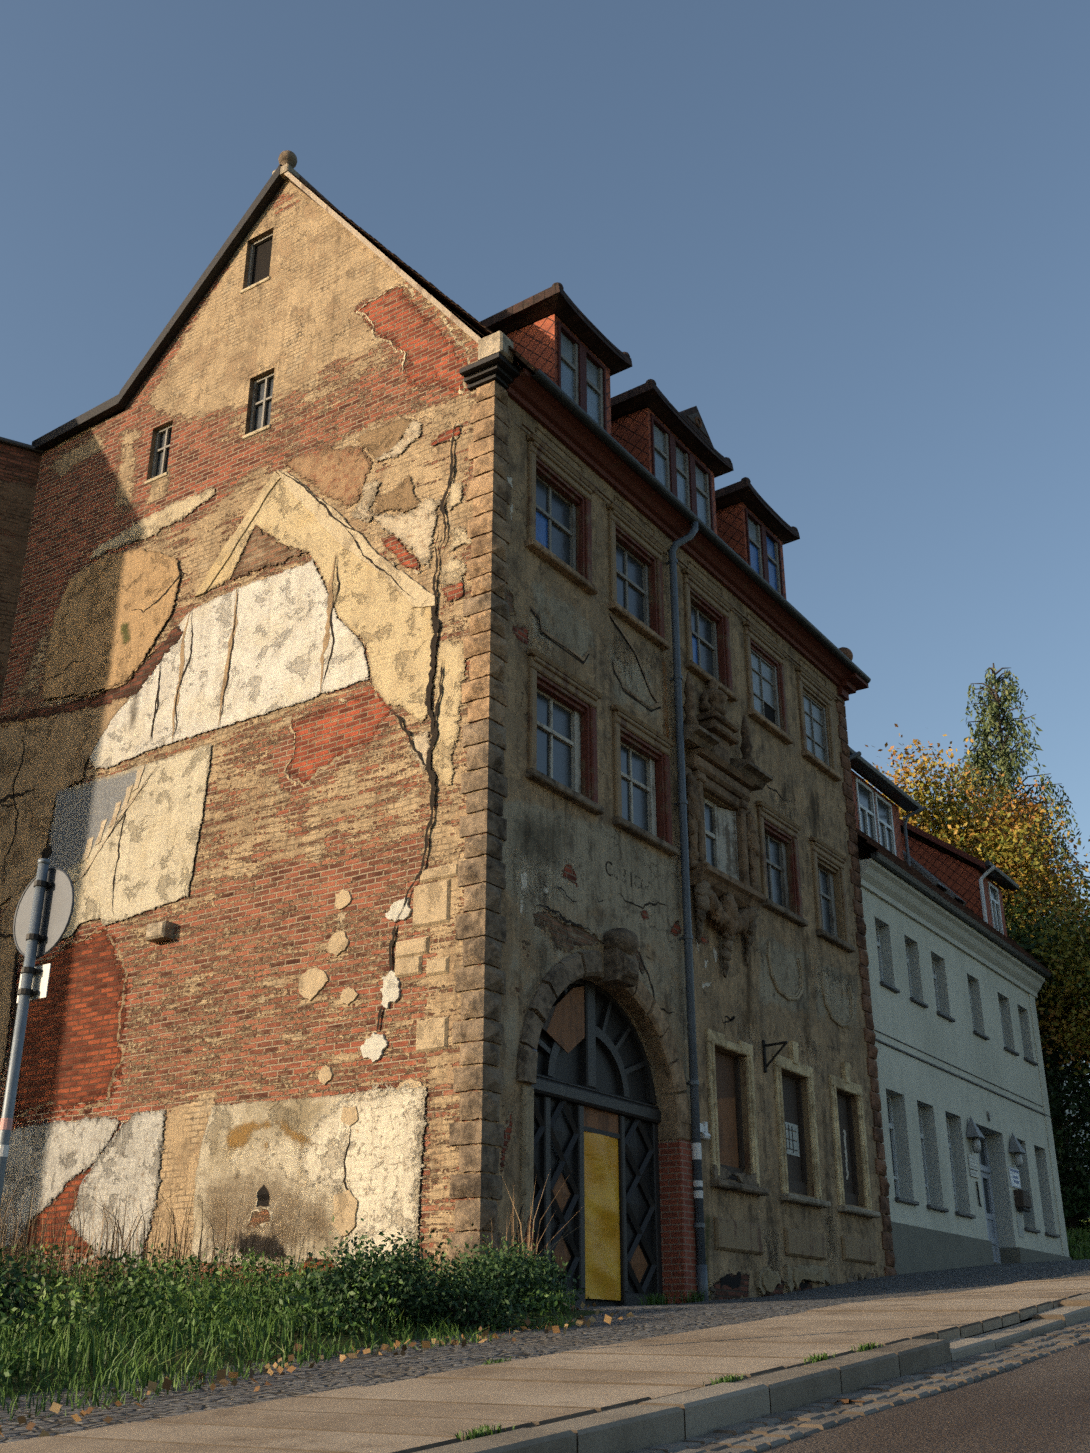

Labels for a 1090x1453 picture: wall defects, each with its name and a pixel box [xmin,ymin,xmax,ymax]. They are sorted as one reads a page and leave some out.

spalling [354,284,474,395]
crack [131,559,182,613]
spalling [283,686,392,787]
crack [278,423,456,1031]
spalling [520,872,604,954]
spalling [561,864,578,887]
spalling [13,928,133,1126]
spalling [22,1123,124,1273]
spalling [709,1271,813,1300]